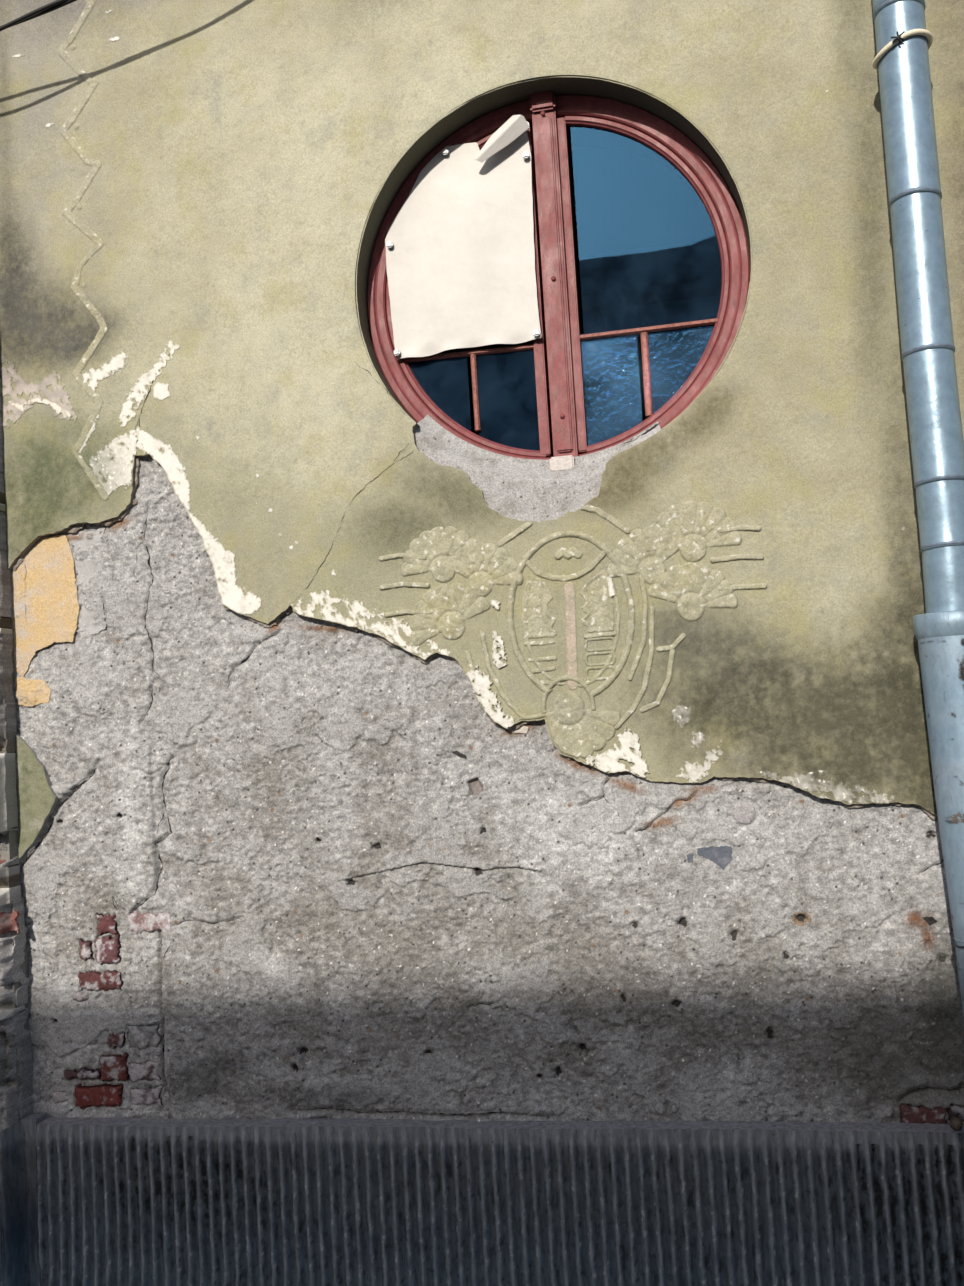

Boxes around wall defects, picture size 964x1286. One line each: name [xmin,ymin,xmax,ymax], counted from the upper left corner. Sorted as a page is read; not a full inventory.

crack [136,512,160,724]
crack [22,769,95,866]
crack [112,757,173,913]
flaking render [0,340,964,1131]
crack [582,776,697,832]
damp [663,619,937,814]